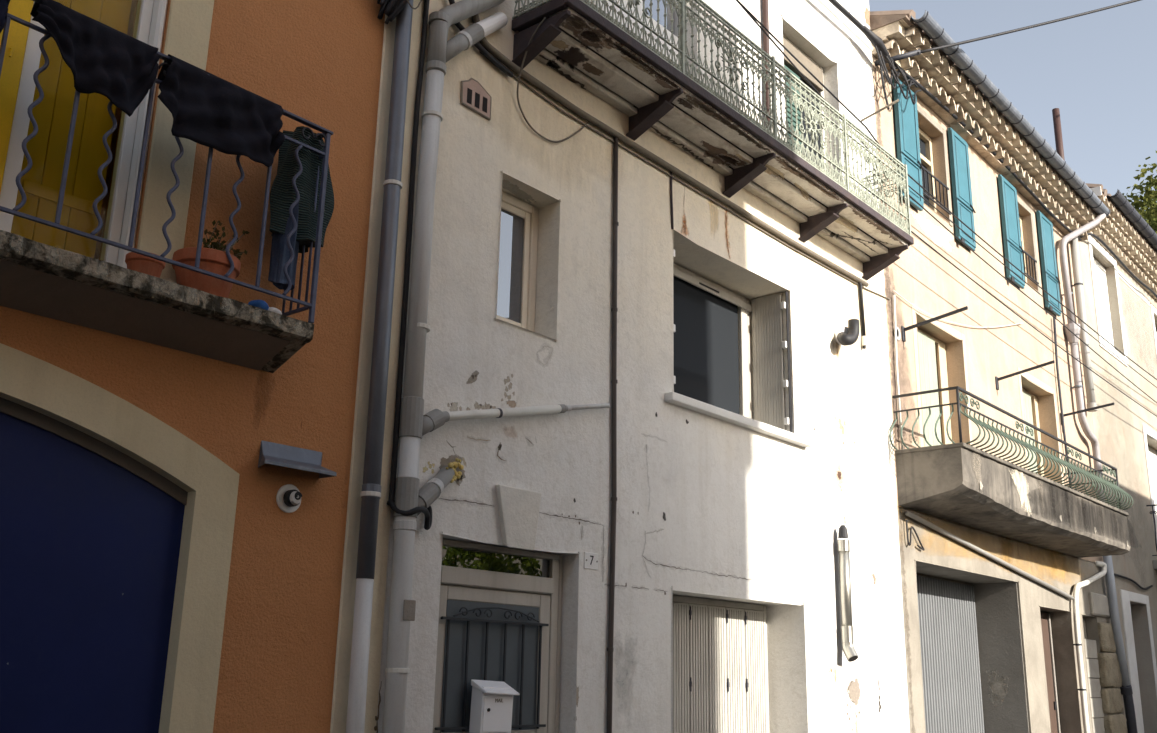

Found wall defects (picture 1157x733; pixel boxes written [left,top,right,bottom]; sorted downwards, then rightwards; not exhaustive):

peeling [447,374,516,411]
crack [539,512,604,542]
crack [605,435,775,595]